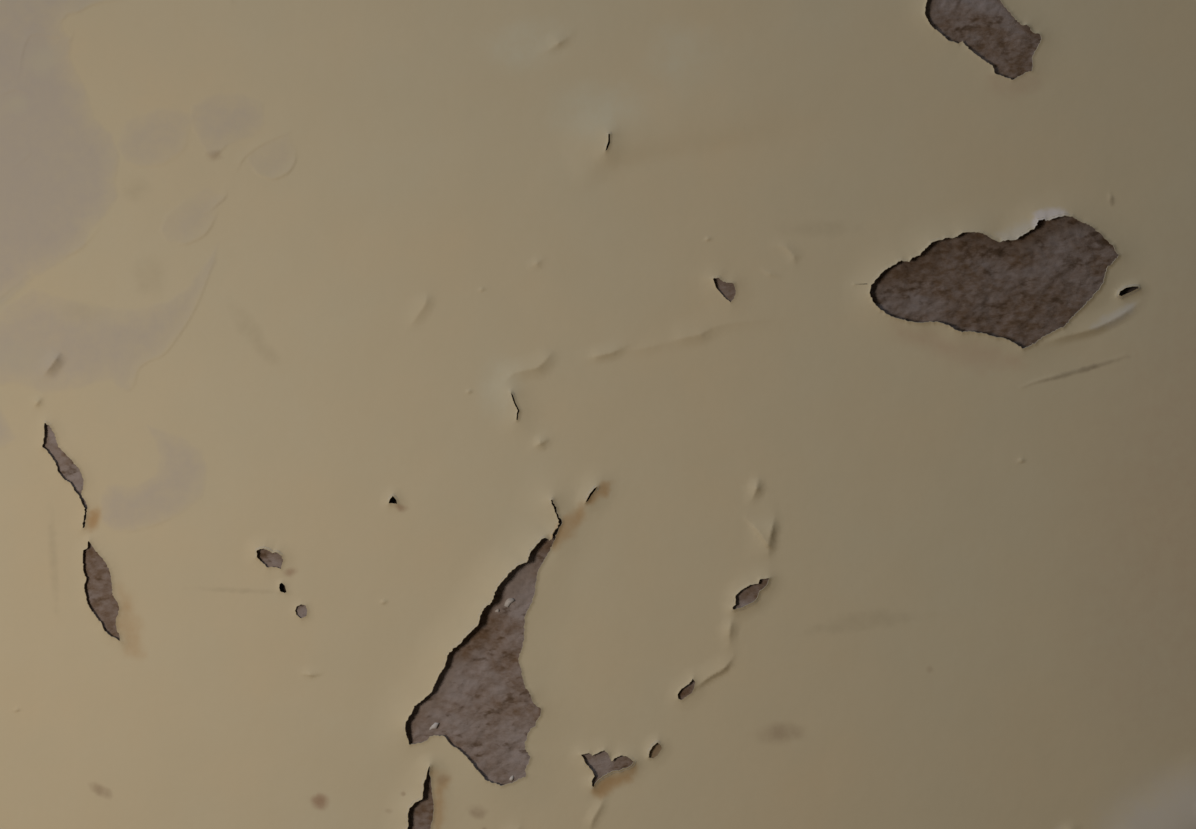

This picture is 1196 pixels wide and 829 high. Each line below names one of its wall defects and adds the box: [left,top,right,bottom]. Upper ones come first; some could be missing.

peeling [920,0,1047,86]
flaking render [713,278,736,302]
peeling [864,211,1143,354]
peeling [39,419,126,647]
flaking render [253,544,310,621]
peeling [729,574,775,614]
peeling [401,495,567,829]
peeling [673,673,700,705]
peeling [576,738,668,791]